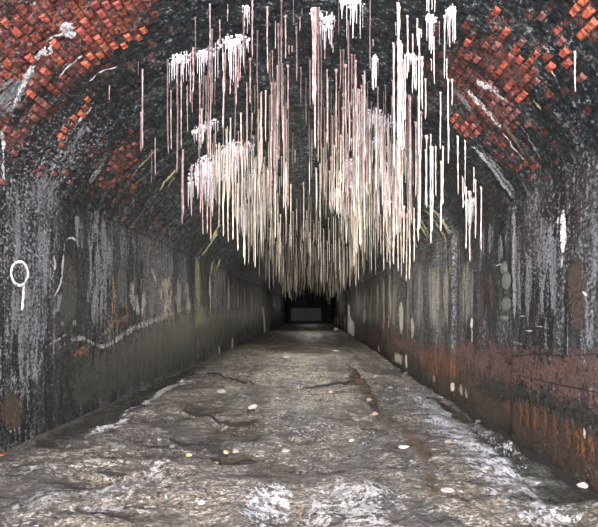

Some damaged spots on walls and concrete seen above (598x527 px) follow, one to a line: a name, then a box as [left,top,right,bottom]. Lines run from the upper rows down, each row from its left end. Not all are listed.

efflorescence [0,20,76,113]
spalling [24,0,148,110]
efflorescence [169,5,250,83]
efflorescence [425,6,457,54]
spalling [463,38,541,127]
spalling [545,25,574,73]
spalling [569,0,598,41]
leakage [511,207,594,348]
crack [181,409,260,427]
crack [206,372,253,388]
crack [304,363,384,416]
rust [352,301,598,495]